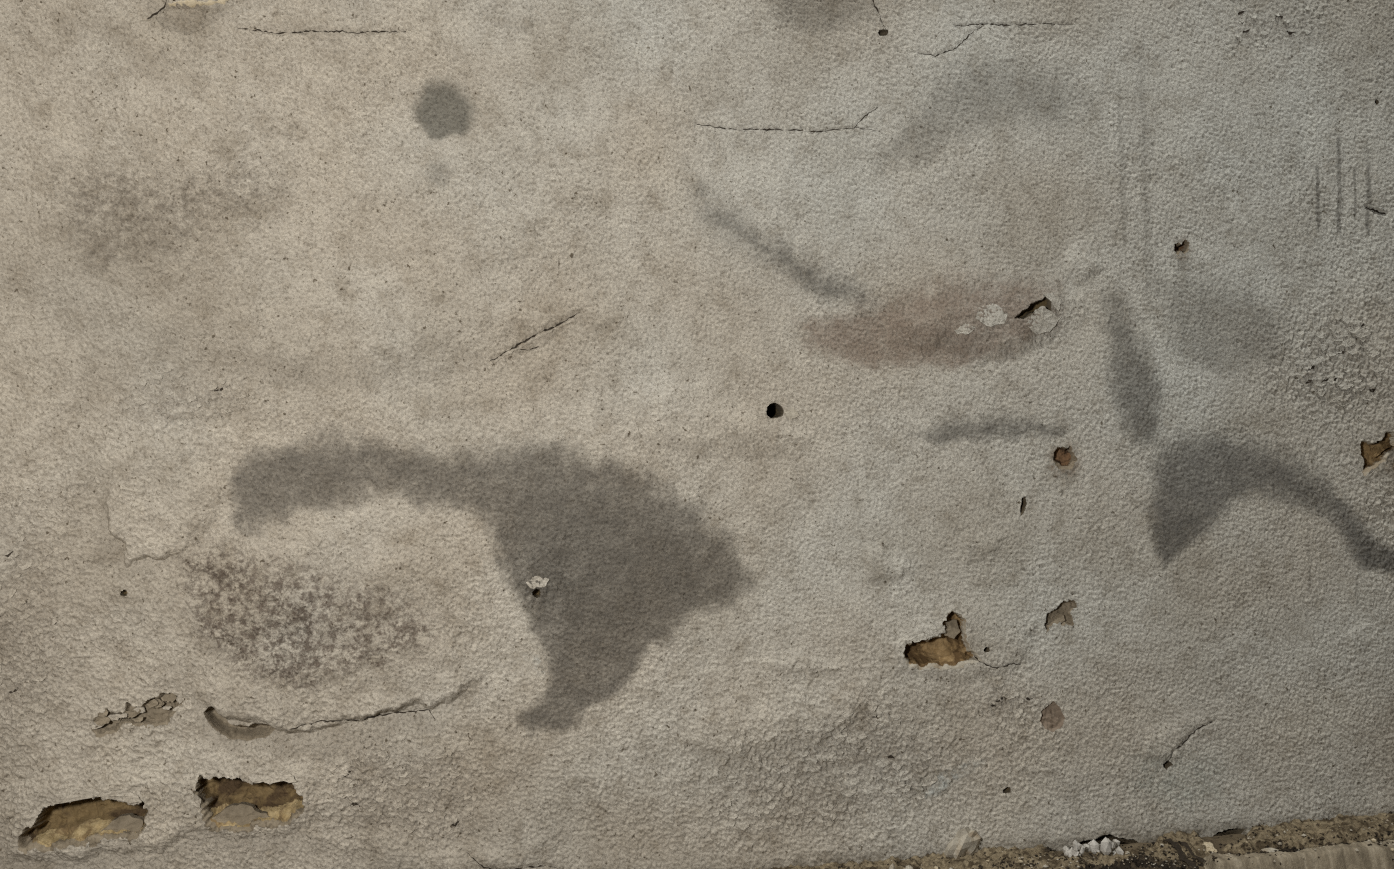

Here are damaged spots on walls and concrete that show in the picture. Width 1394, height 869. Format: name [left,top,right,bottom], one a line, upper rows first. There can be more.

flaking render [168,0,228,8]
flaking render [954,293,1061,335]
flaking render [1053,446,1077,470]
flaking render [1360,431,1394,477]
flaking render [1044,599,1077,633]
flaking render [901,611,990,672]
flaking render [991,681,1065,732]
flaking render [18,787,148,855]
flaking render [185,770,305,838]